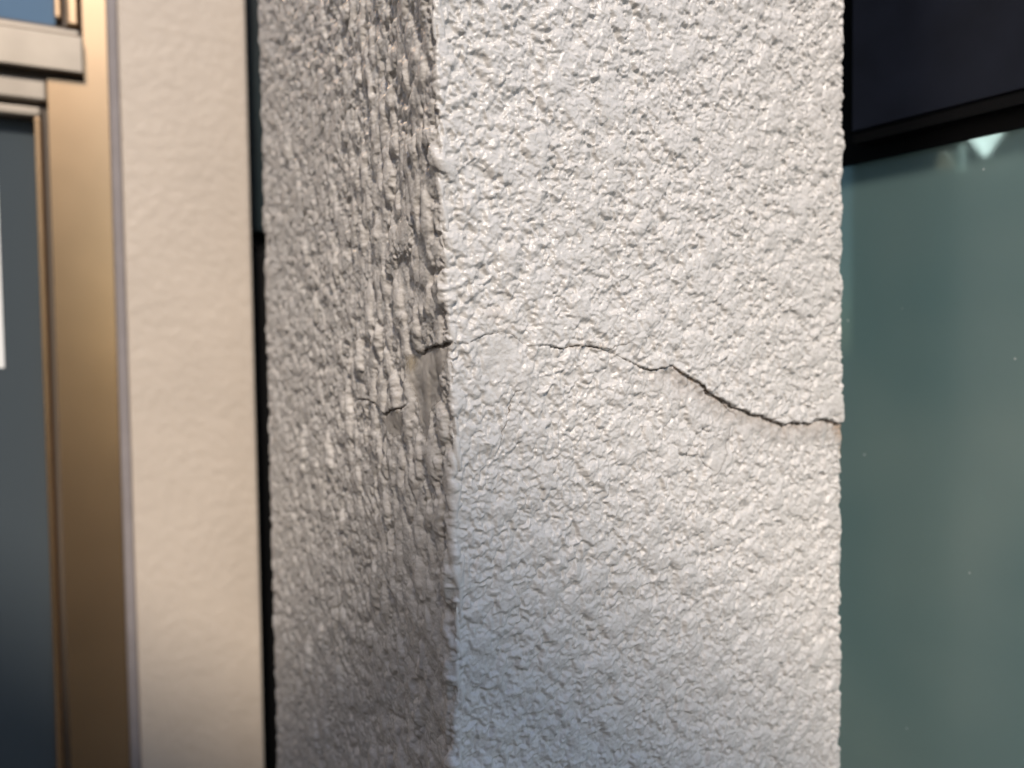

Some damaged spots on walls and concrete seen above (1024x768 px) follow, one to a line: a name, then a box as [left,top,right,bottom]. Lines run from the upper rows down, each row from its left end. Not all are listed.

crack [418,331,840,477]